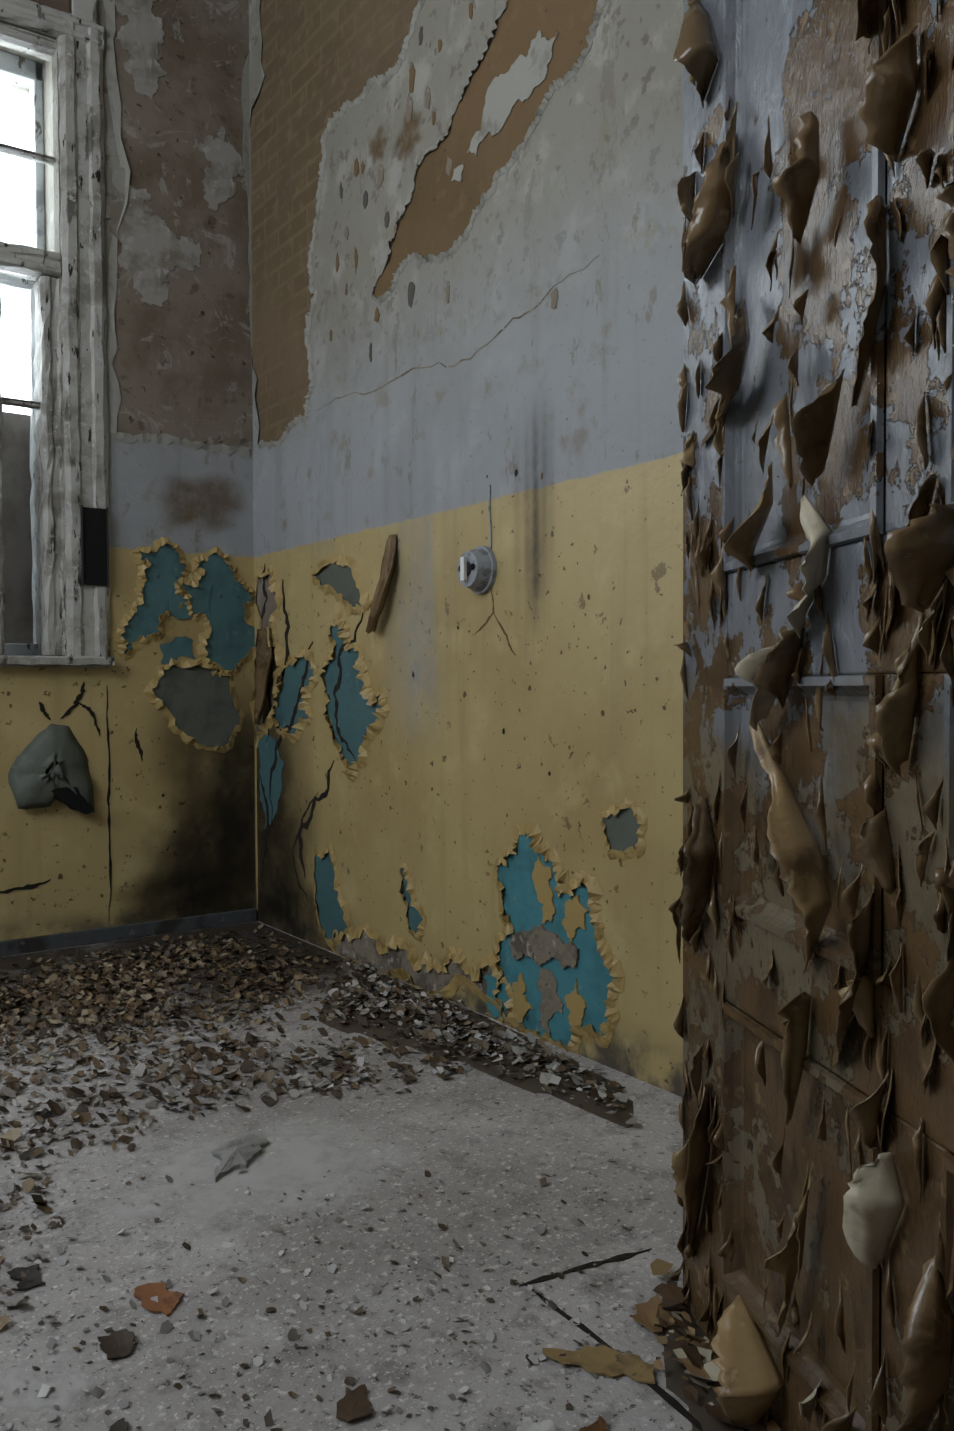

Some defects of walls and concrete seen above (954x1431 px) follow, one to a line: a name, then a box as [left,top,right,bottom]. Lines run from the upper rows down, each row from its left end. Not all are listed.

spalling [103,0,607,459]
peeling [677,101,738,289]
peeling [773,111,820,245]
peeling [856,0,918,177]
peeling [679,266,751,491]
peeling [111,534,396,828]
peeling [723,195,888,974]
peeling [875,474,954,776]
damp [140,750,319,941]
peeling [312,819,625,1054]
peeling [842,1069,905,1269]
peeling [630,1162,813,1426]